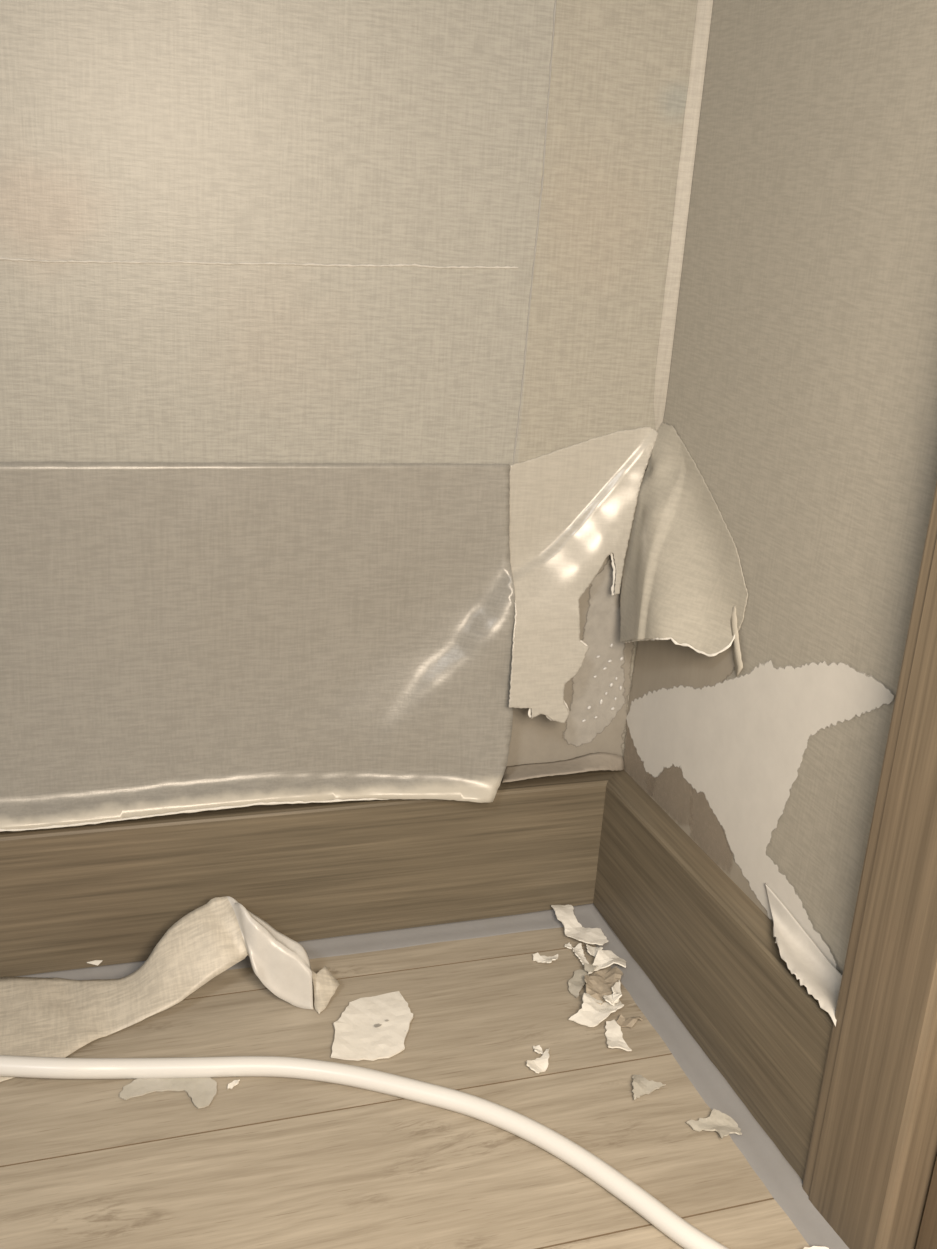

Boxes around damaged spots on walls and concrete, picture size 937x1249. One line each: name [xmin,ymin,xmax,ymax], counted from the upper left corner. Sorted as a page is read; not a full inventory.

peeling [579,555,611,640]
peeling [503,606,894,968]
peeling [612,980,622,1003]